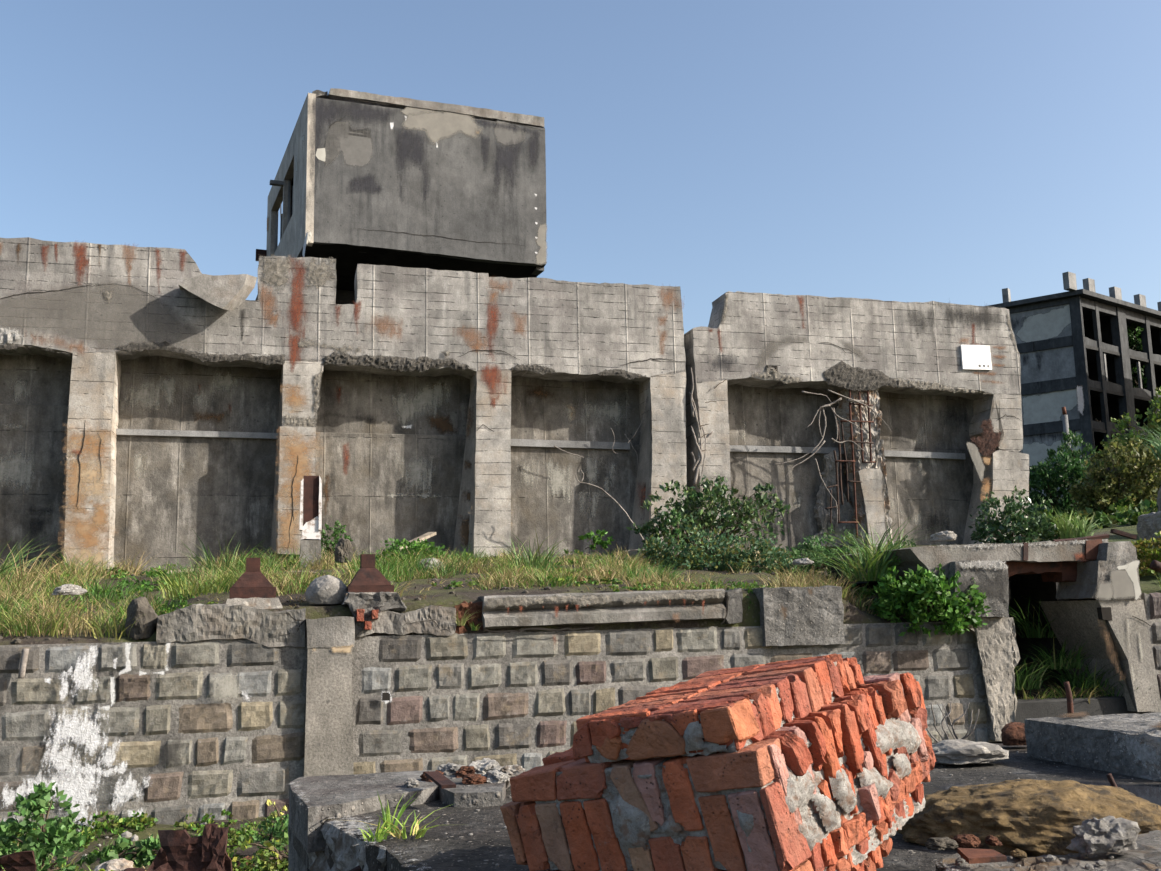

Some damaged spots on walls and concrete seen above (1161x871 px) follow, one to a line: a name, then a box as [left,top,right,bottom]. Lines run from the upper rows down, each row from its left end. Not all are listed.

leakage [302,99,438,197]
peeling [401,106,525,146]
leakage [475,119,538,187]
rust [74,243,101,278]
peeling [0,284,285,365]
rust [290,264,305,368]
rust [462,285,506,407]
peeling [1007,304,1071,350]
peeling [1022,386,1084,425]
crack [77,420,101,509]
crack [288,459,298,548]
peeling [1022,432,1082,466]